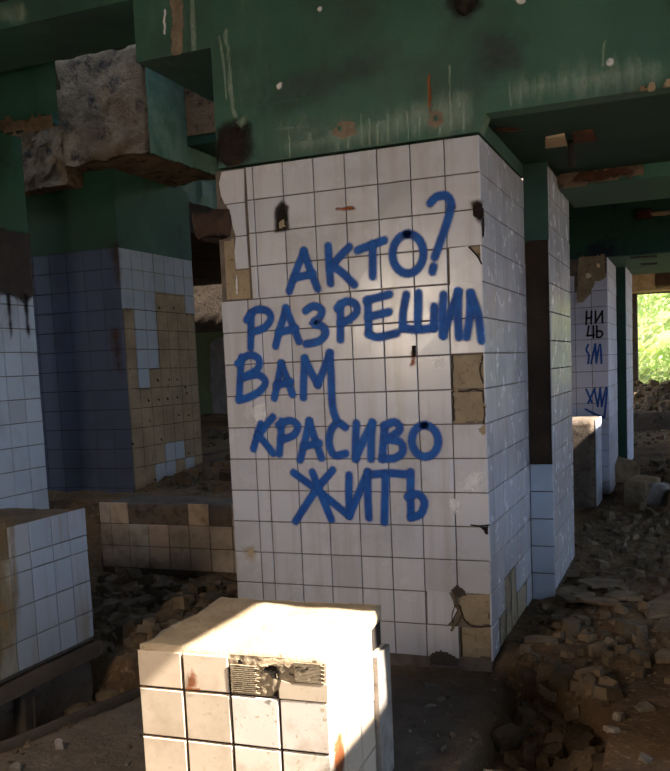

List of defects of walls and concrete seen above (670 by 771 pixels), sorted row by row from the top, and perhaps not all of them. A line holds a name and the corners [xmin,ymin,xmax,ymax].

spalling [640,79,670,92]
spalling [0,44,216,197]
corrosion [557,165,644,189]
spalling [224,239,251,300]
spalling [124,294,203,489]
peeling [209,337,228,414]
spalling [451,355,487,435]
spalling [230,654,325,698]
corrosion [334,732,345,771]